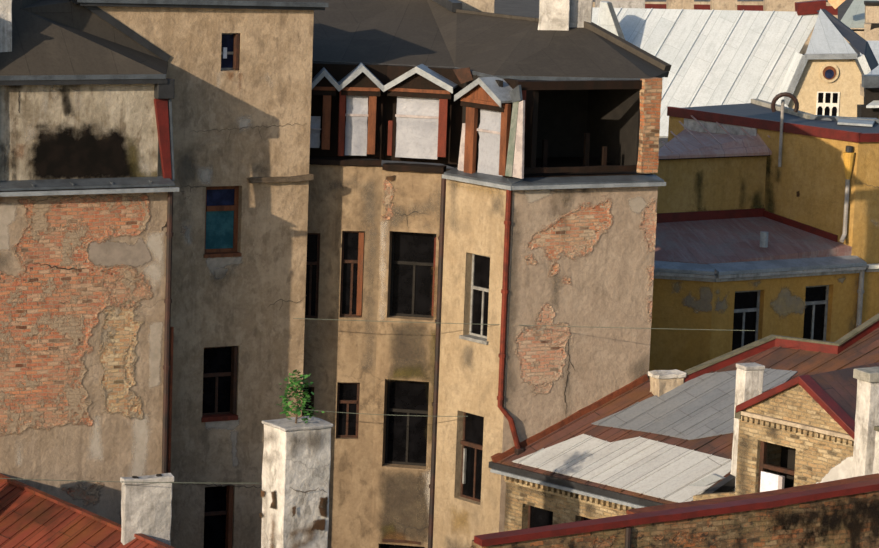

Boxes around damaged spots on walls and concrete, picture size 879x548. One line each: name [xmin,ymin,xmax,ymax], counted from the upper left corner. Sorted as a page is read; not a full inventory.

flaking render [525,198,613,285]
flaking render [0,194,163,436]
flaking render [514,303,571,396]
peeling [770,288,806,316]
leakage [846,523,863,548]